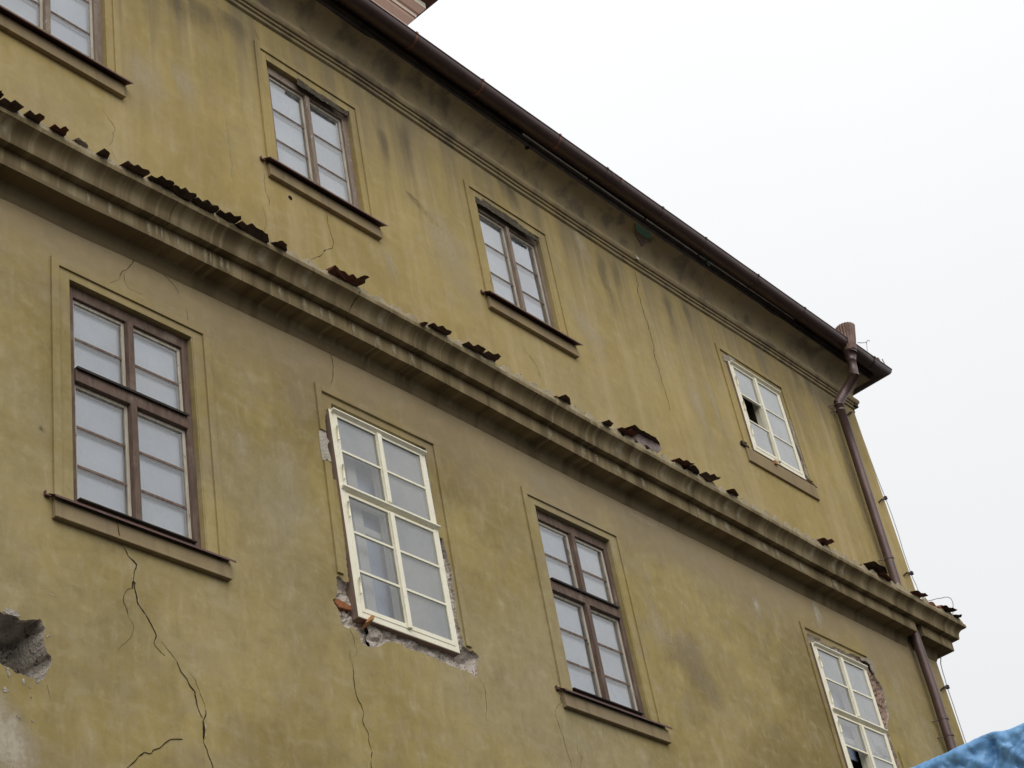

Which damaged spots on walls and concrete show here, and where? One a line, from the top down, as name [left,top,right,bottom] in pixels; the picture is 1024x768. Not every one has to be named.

flaking render [319,430,332,462]
spalling [0,608,50,699]
crack [117,523,214,768]
flaking render [333,559,477,676]
flaking render [855,657,898,768]